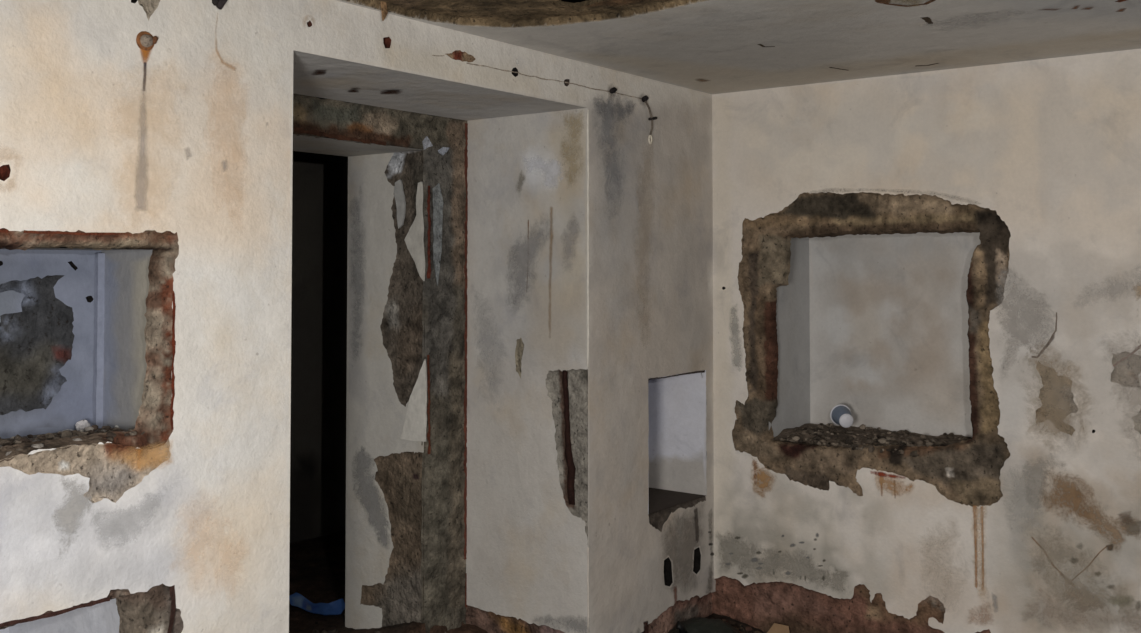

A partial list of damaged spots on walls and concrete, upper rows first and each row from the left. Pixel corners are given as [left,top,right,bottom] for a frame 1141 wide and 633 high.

flaking render [131,0,160,20]
peeling [394,179,443,286]
spalling [0,228,179,503]
peeling [400,359,427,442]
spalling [722,192,1011,507]
flaking render [1111,345,1141,389]
spalling [545,369,588,544]
spalling [0,583,184,633]
flaking render [466,605,565,633]
spalling [664,557,673,587]
flaking render [641,576,946,633]
corrosion [971,505,996,623]